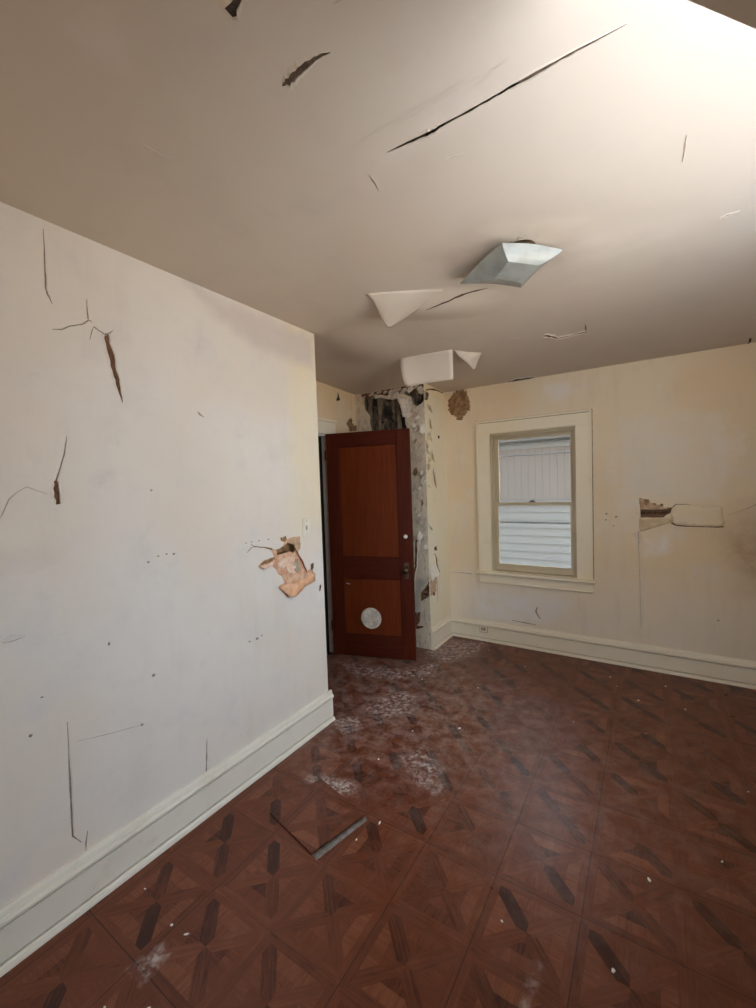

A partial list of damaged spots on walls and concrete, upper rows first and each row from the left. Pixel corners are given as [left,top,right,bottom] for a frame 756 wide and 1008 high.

crack [42,229,53,304]
crack [52,299,113,340]
crack [54,436,67,481]
spalling [361,384,470,629]
spalling [246,536,321,597]
spalling [637,498,725,620]